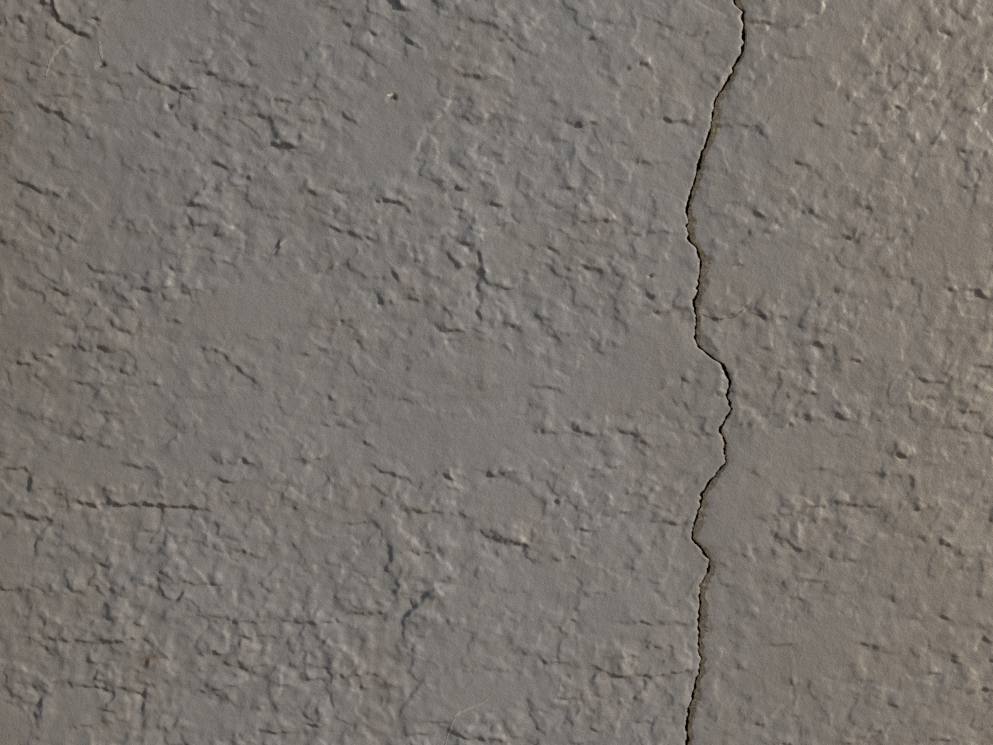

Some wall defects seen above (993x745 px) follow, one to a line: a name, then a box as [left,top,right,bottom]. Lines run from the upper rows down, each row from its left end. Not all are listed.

crack [685,0,769,745]